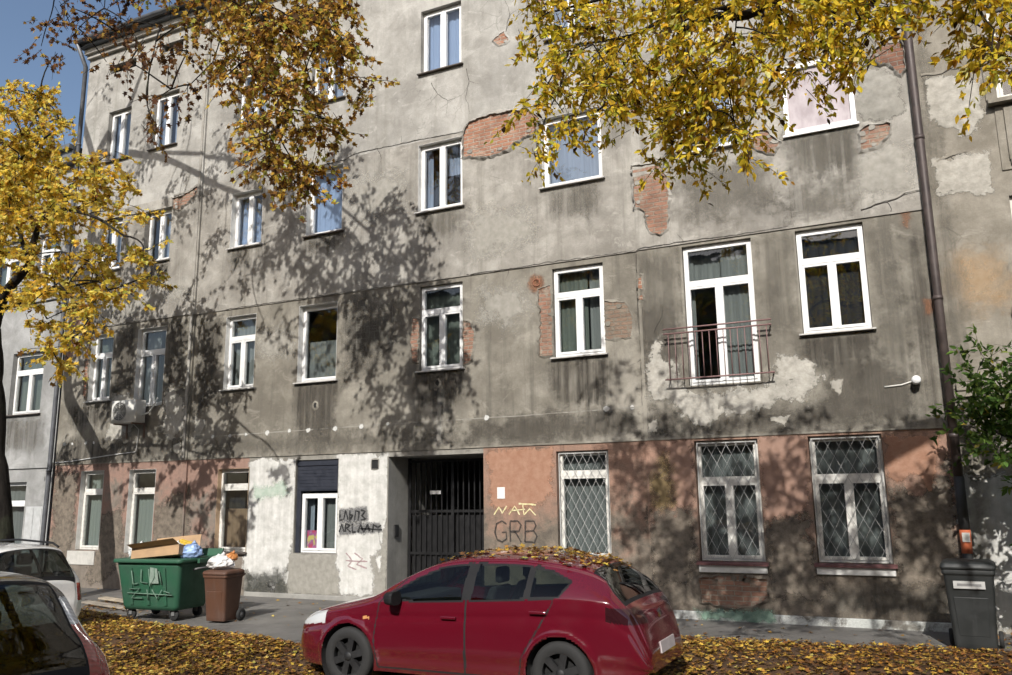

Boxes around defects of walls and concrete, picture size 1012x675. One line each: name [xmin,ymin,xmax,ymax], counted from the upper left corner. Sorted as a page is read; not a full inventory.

spalling [867,30,907,79]
crack [317,68,474,166]
spalling [461,105,542,161]
peeling [924,74,987,137]
spalling [630,161,673,237]
crack [861,188,920,217]
peeling [931,150,995,197]
spalling [462,285,554,366]
damp [552,358,606,400]
damp [297,383,337,439]
peeling [242,457,296,592]
peeling [645,434,834,612]